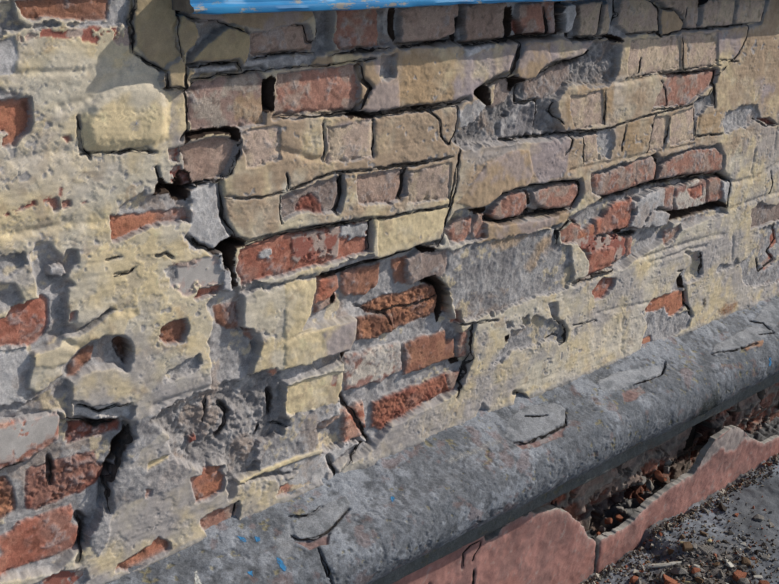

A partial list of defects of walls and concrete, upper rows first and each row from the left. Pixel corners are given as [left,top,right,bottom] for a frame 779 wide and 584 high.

peeling [20,19,105,44]
spalling [0,0,133,36]
flaking render [0,87,33,146]
peeling [4,186,72,216]
spalling [82,0,733,556]
spalling [0,241,141,576]
crack [514,412,567,445]
crack [347,436,367,466]
spalling [35,569,89,584]
flaking render [115,536,170,570]
crack [291,509,349,584]
crack [462,541,481,584]